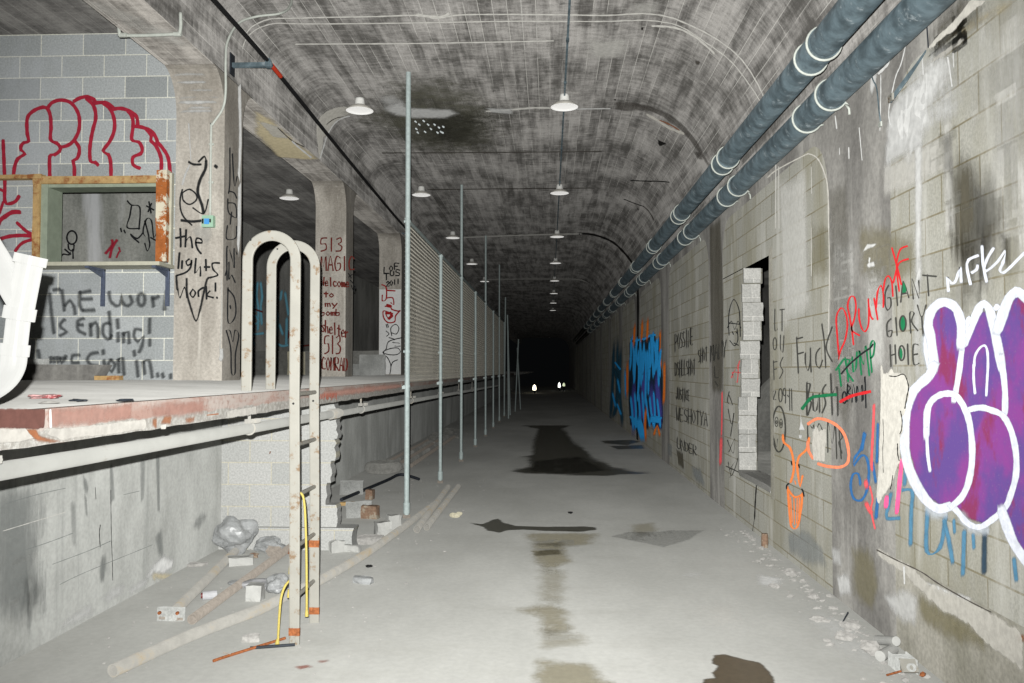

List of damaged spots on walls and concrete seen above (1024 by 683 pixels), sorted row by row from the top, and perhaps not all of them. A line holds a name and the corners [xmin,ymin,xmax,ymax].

damp [952,164,1008,280]
damp [514,425,644,476]
damp [473,519,596,567]
spalling [876,549,1023,670]
damp [539,662,601,683]
damp [703,655,774,683]